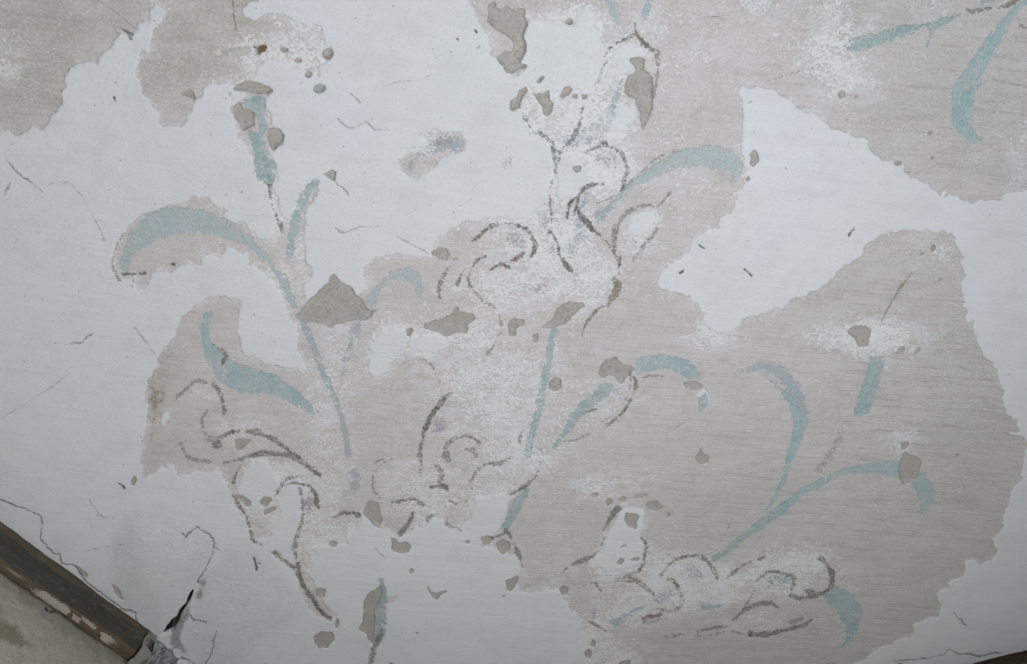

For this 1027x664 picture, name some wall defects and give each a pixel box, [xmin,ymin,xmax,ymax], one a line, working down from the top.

flaking render [487,1,528,78]
peeling [605,41,646,77]
flaking render [624,57,653,129]
peeling [0,0,333,301]
peeling [555,156,588,200]
peeling [627,212,656,235]
flaking render [295,274,377,328]
peeling [368,329,405,376]
peeling [409,336,445,353]
crack [0,499,138,622]
peeling [597,508,646,572]
crack [164,526,217,664]